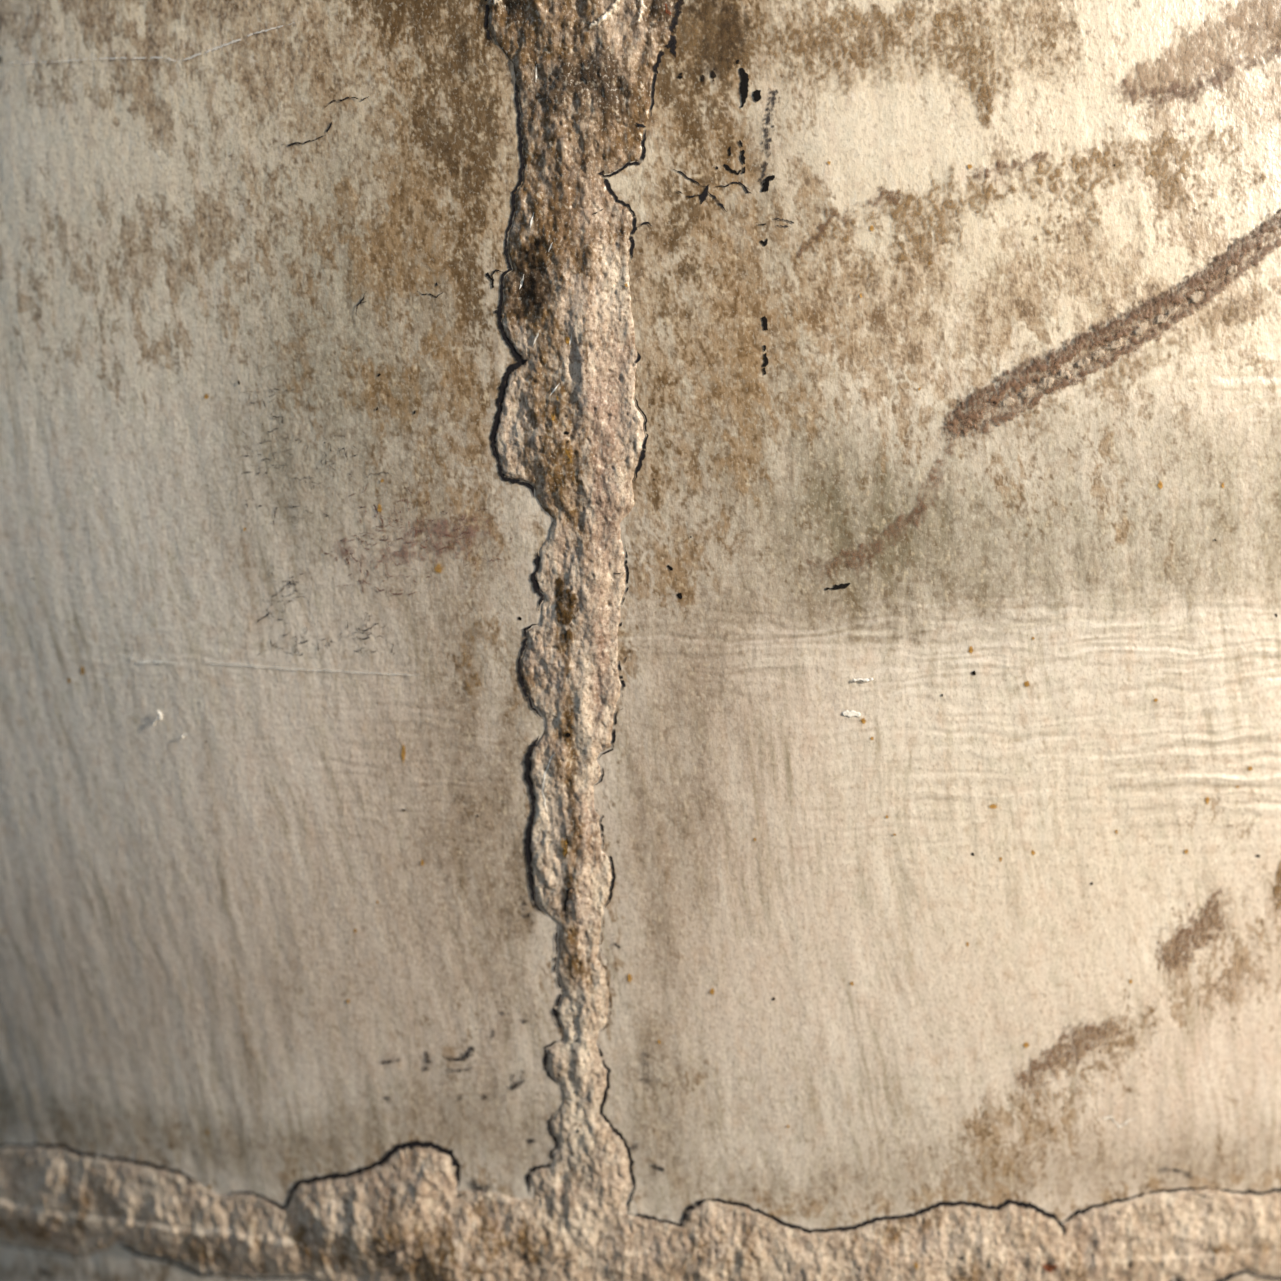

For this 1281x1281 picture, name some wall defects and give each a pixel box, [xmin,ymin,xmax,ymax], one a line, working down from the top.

crack [592,0,751,263]
damp [674,0,1077,128]
damp [795,125,1242,266]
damp [1123,0,1281,118]
crack [490,81,534,495]
damp [930,209,1281,486]
crack [634,397,649,481]
crack [242,365,575,1195]
crack [596,546,1281,1236]
damp [1157,891,1234,970]
damp [1011,1017,1133,1106]
crack [229,1140,462,1210]